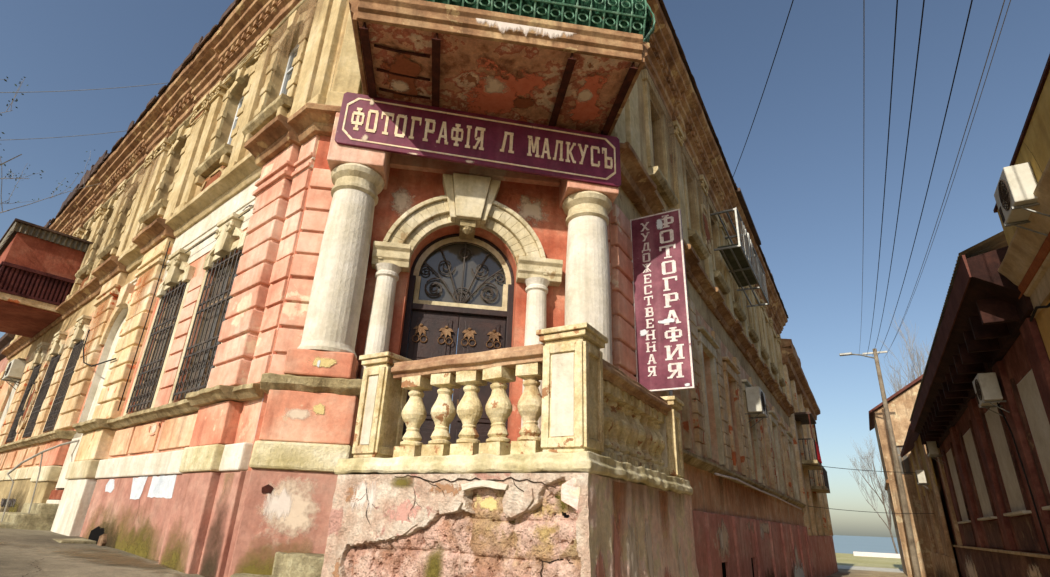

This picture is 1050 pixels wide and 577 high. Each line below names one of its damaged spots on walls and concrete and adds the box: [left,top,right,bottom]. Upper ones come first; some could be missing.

water stain [476,18,573,38]
spalling [382,53,422,101]
spalling [460,57,548,122]
spalling [568,73,610,124]
water stain [199,519,221,577]
peeling [262,480,319,536]
spalling [332,477,589,577]
crack [394,475,555,520]
crack [540,558,573,577]
peeling [596,513,622,577]